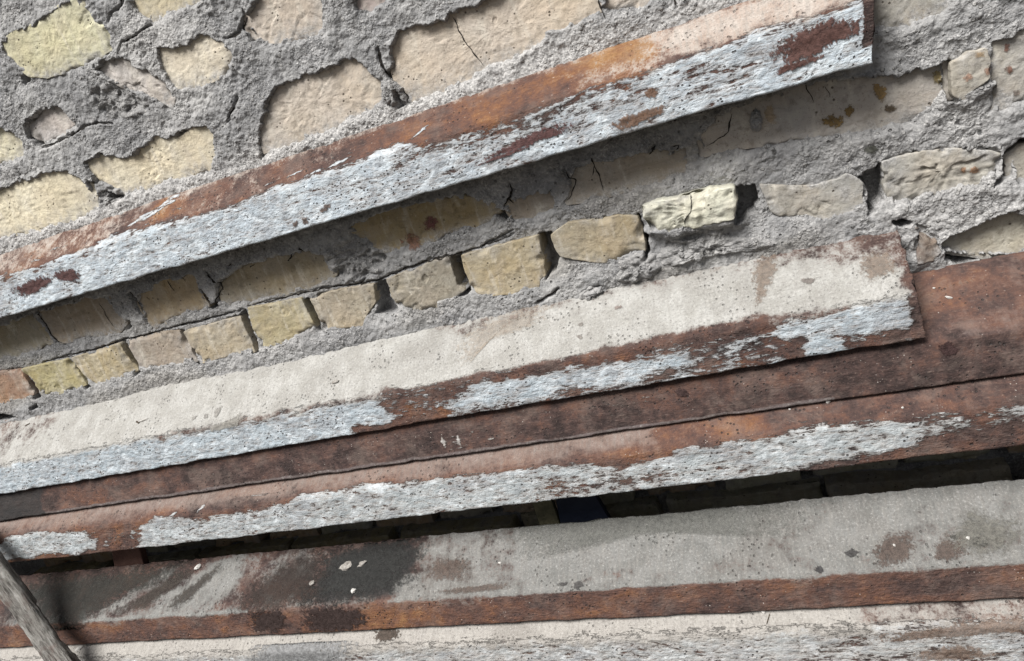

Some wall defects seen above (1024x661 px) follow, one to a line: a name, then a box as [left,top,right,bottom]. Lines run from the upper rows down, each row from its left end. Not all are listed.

crack [452,16,482,63]
rust [765,11,870,75]
spalling [96,81,149,120]
rust [607,87,665,131]
rust [476,122,573,166]
spalling [100,188,124,205]
rust [10,269,80,296]
spalling [322,234,388,284]
water stain [26,560,221,631]
water stain [237,536,432,614]
rust [247,602,401,642]
rust [869,614,1024,661]